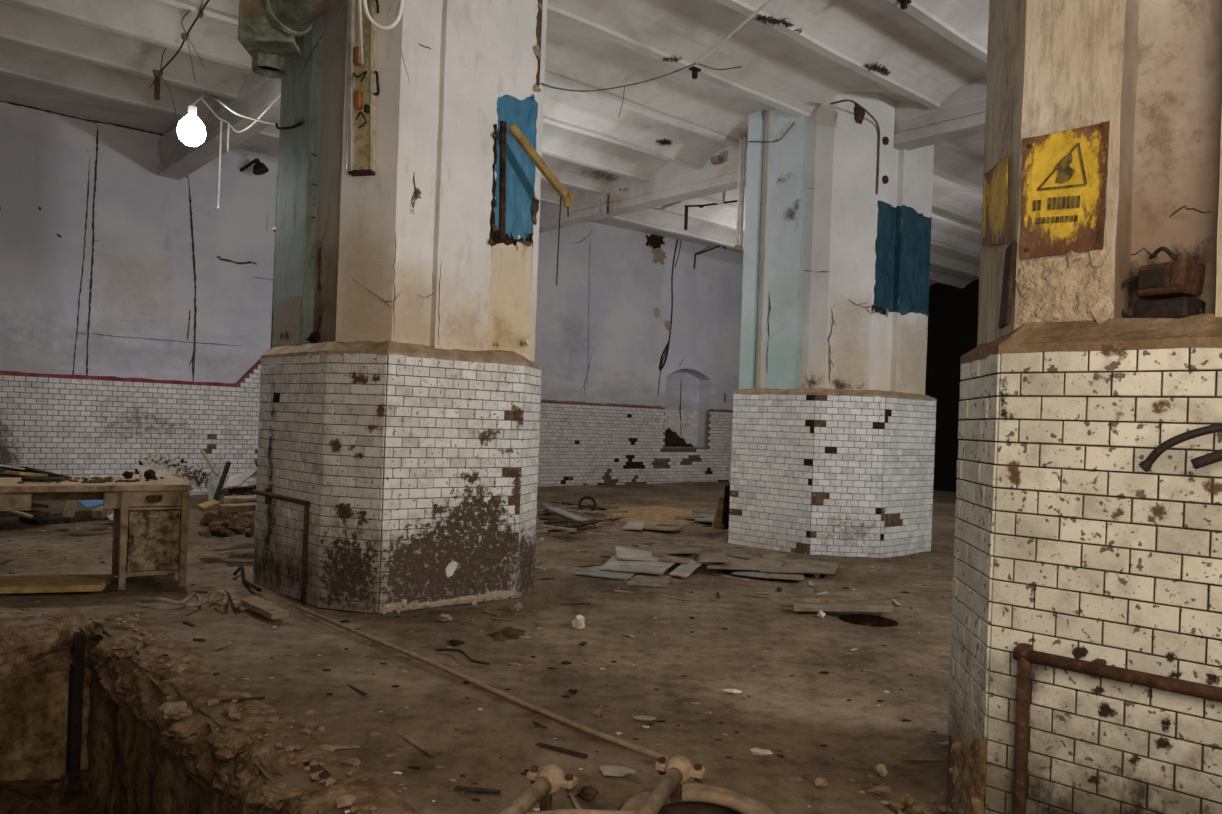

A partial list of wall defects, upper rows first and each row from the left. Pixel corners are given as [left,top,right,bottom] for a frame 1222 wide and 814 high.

peeling [487,0,543,354]
peeling [805,420,826,433]
peeling [872,409,892,429]
spalling [561,428,742,516]
peeling [804,446,837,506]
peeling [875,507,903,541]
peeling [791,531,816,554]
corrosion [1072,647,1088,659]
corrosion [1165,652,1182,678]
corrosion [1206,673,1221,685]
corrosion [1092,686,1115,718]
corrosion [1157,718,1173,754]